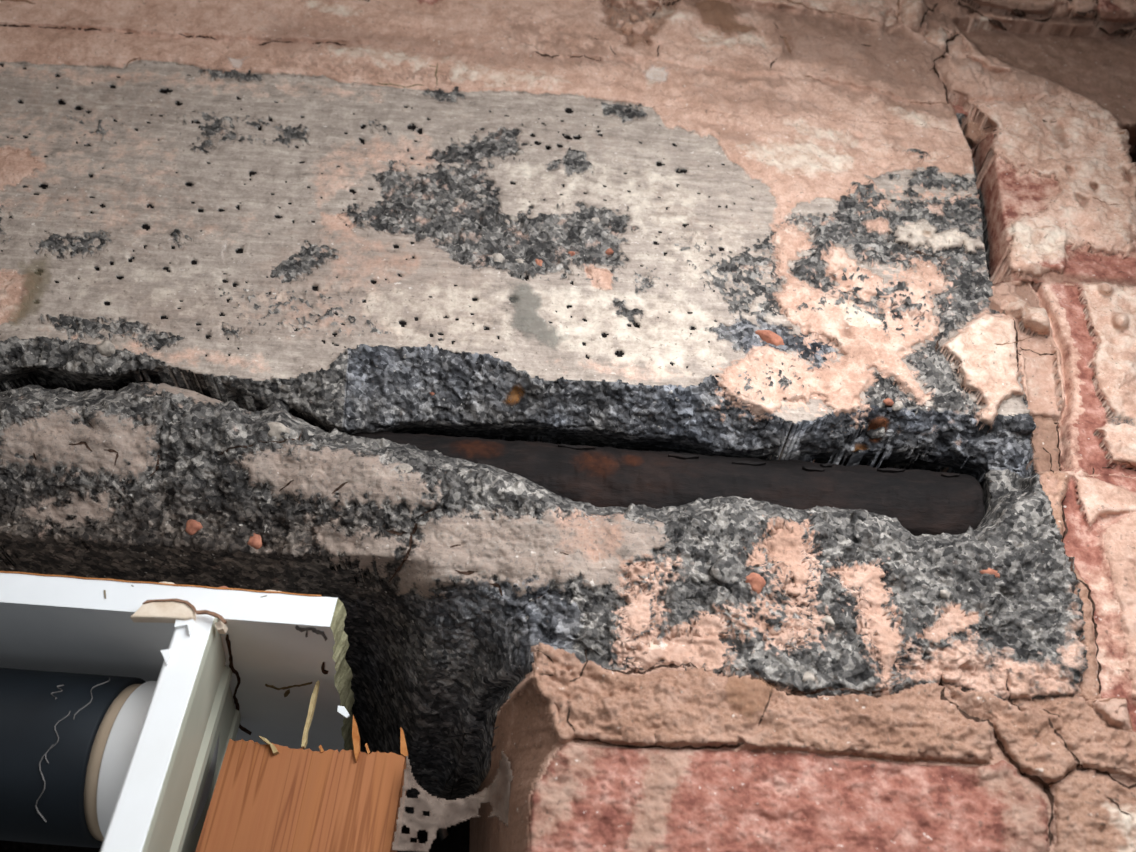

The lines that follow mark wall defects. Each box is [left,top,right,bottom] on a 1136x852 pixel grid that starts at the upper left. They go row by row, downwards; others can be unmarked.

crack [0,0,140,67]
crack [259,39,343,47]
spalling [192,112,251,155]
spalling [199,69,264,83]
spalling [423,86,465,104]
spalling [596,102,650,125]
spalling [337,124,641,282]
crack [0,374,136,392]
crack [219,407,332,455]
spalling [0,148,1088,823]
crack [1030,419,1136,732]
crack [811,671,1136,845]